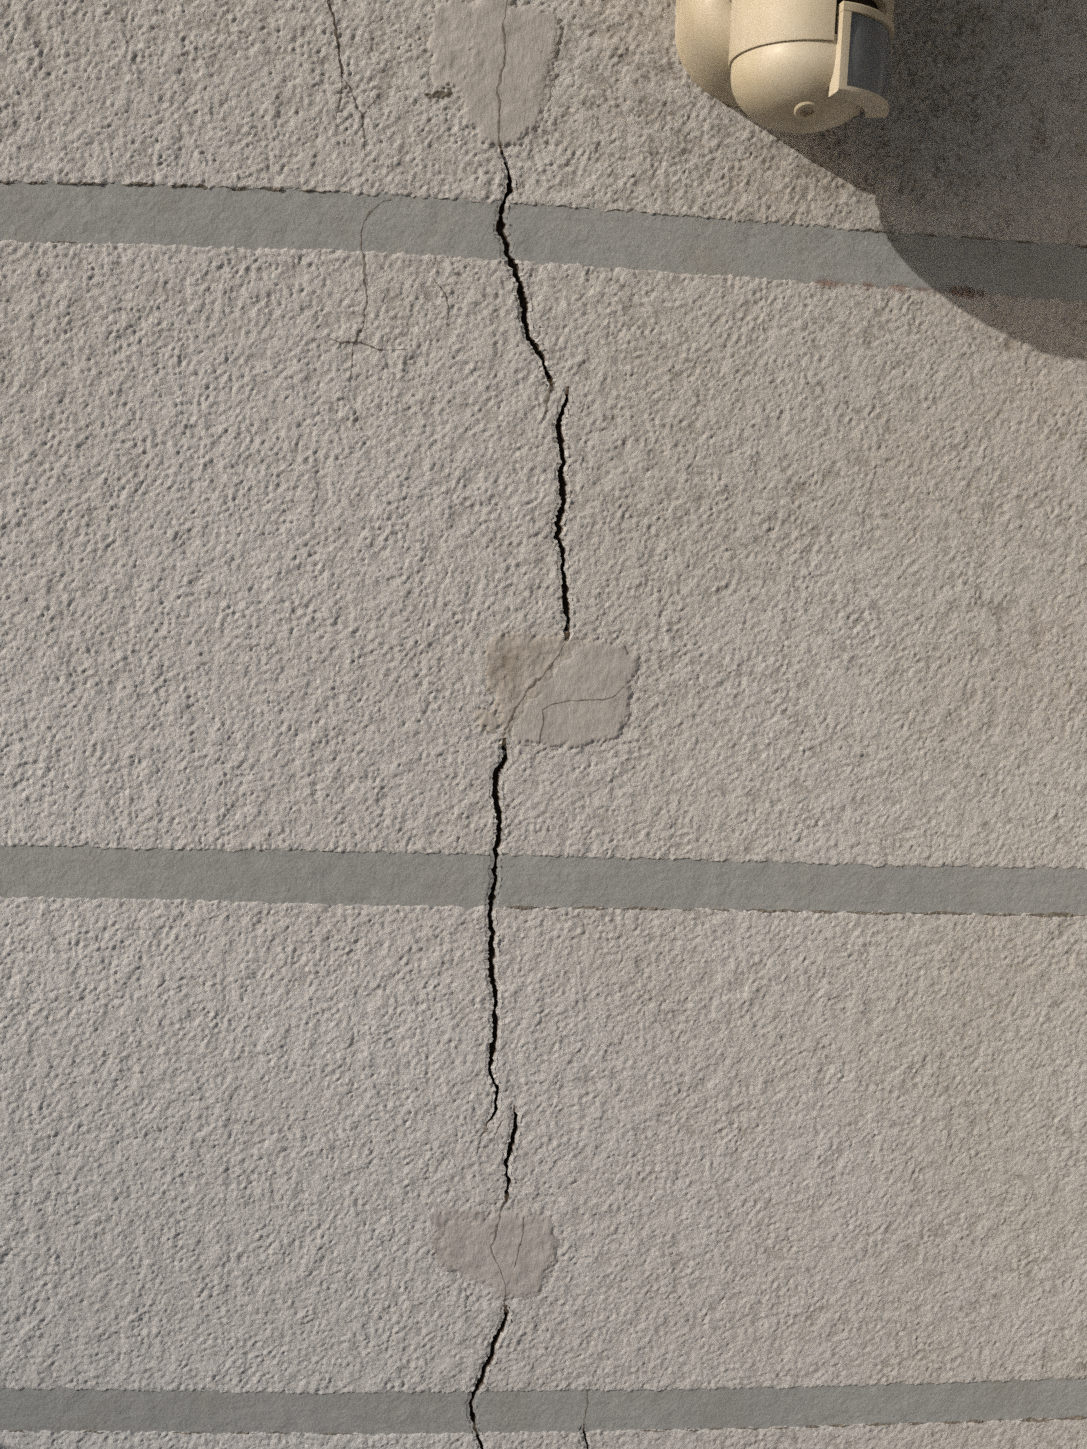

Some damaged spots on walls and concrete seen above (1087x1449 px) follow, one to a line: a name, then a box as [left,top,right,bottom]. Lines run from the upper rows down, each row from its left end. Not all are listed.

crack [327,0,397,155]
crack [327,198,407,377]
crack [465,1,624,1449]